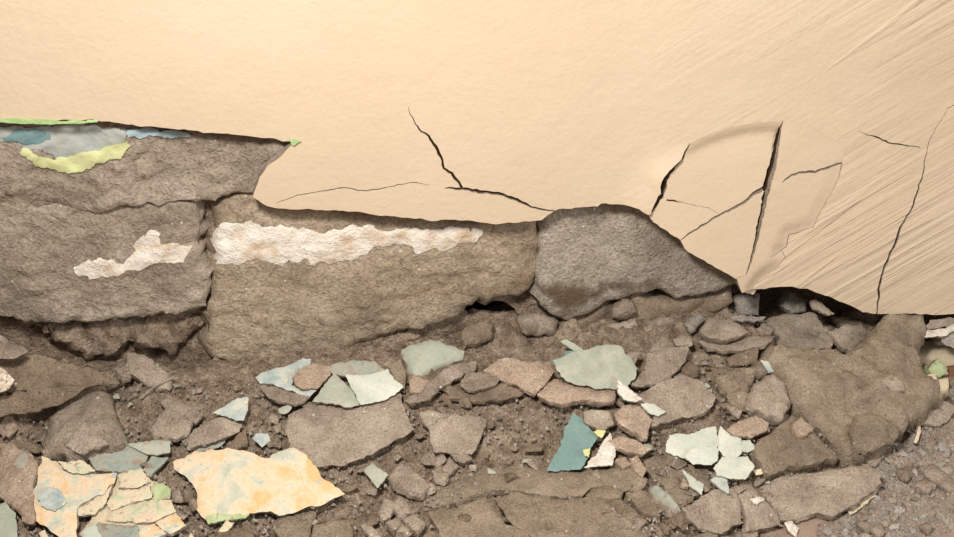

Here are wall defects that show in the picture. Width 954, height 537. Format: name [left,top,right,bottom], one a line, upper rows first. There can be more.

spalling [0,118,888,369]
crack [408,107,554,212]
crack [660,125,781,236]
crack [861,130,935,315]
spalling [913,313,954,330]
peeling [182,424,226,452]
peeling [212,397,249,421]
peeling [253,433,271,447]